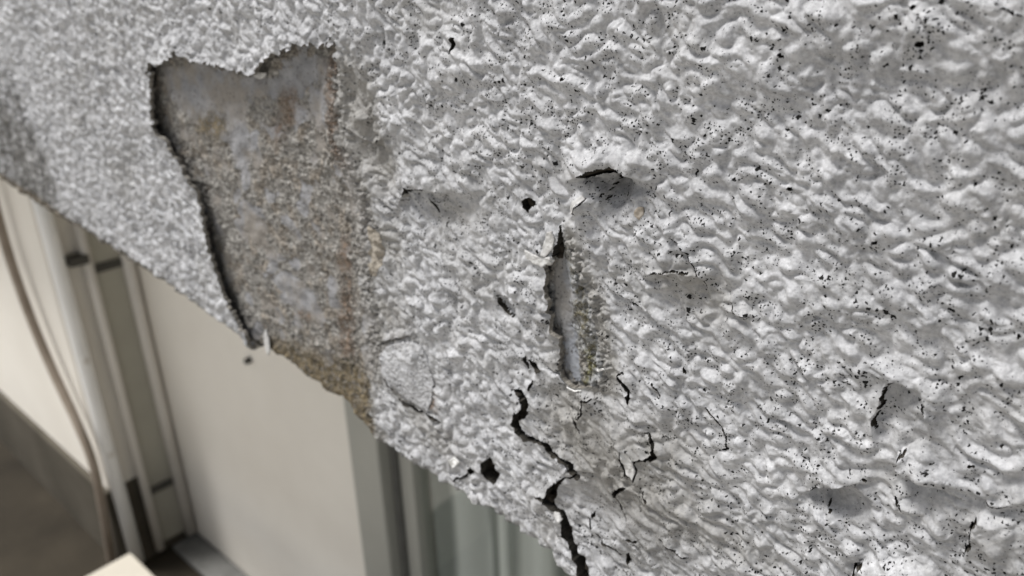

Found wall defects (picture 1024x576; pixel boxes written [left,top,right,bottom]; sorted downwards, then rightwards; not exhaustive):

spalling [144,37,435,437]
spalling [524,231,605,392]
crack [510,356,692,576]